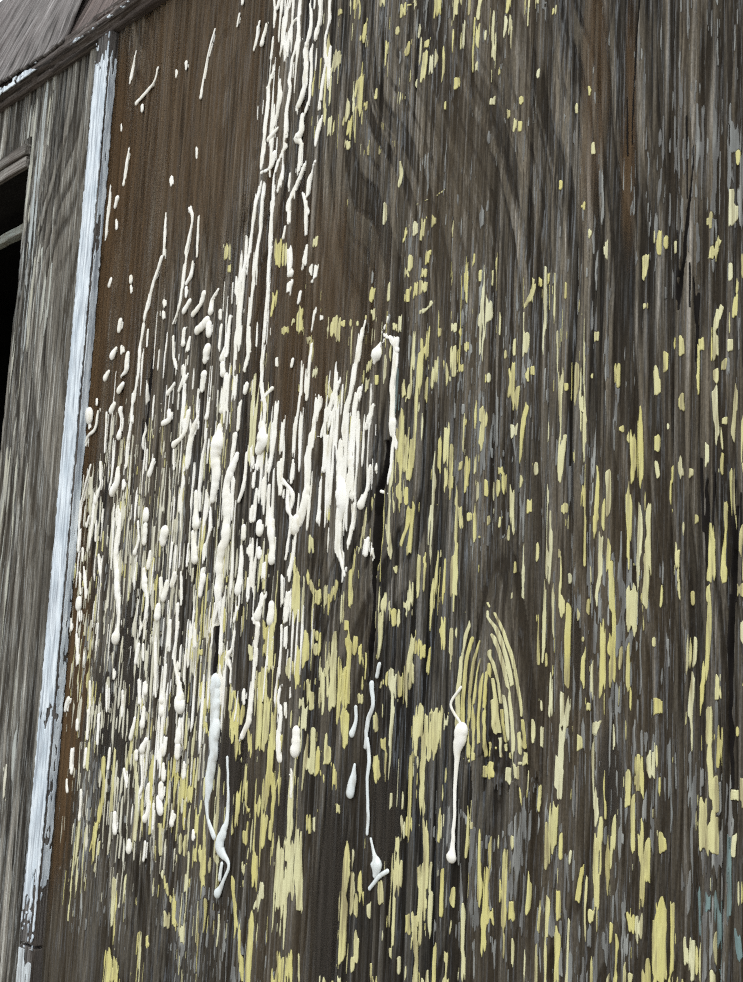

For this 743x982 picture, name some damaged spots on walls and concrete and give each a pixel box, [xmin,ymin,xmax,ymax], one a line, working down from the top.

peeling [0,76,55,811]
peeling [16,31,375,982]
crack [367,440,390,683]
peeling [281,0,743,982]
crack [626,0,641,156]
crack [700,458,742,789]